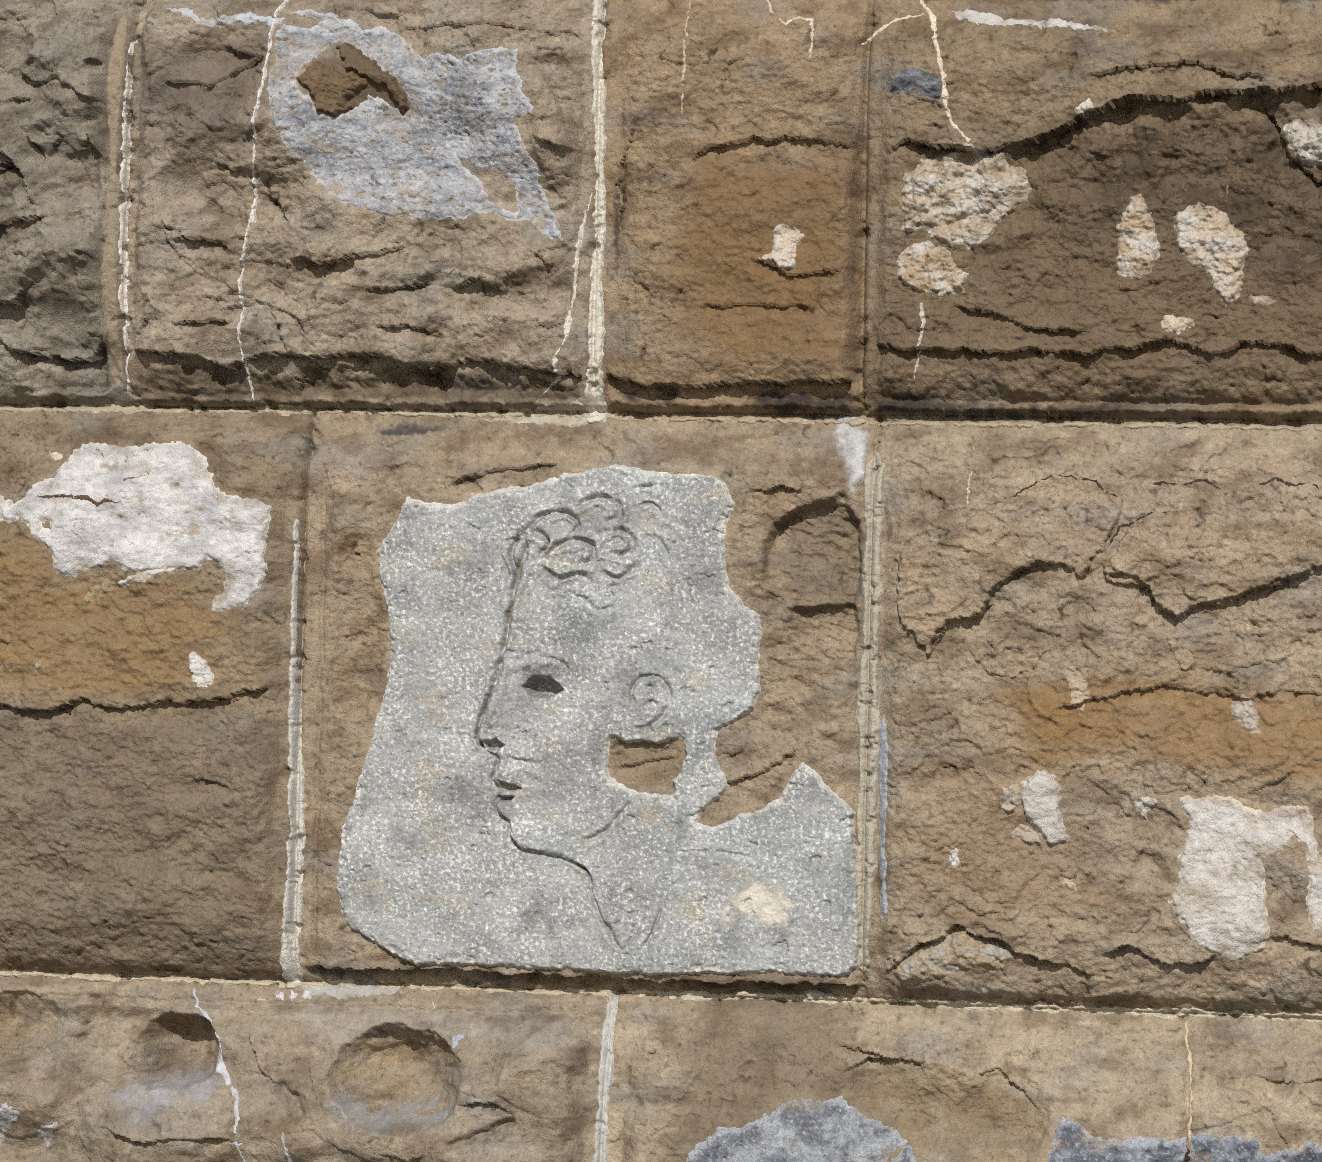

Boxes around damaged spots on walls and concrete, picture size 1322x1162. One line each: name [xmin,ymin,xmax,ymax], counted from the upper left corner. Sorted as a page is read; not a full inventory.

peeling [295,42,409,117]
crack [862,0,971,142]
crack [237,0,289,402]
spalling [981,100,1322,345]
peeling [78,568,175,604]
crack [193,988,245,1162]
spalling [848,1061,1048,1162]
crack [1183,1020,1193,1162]